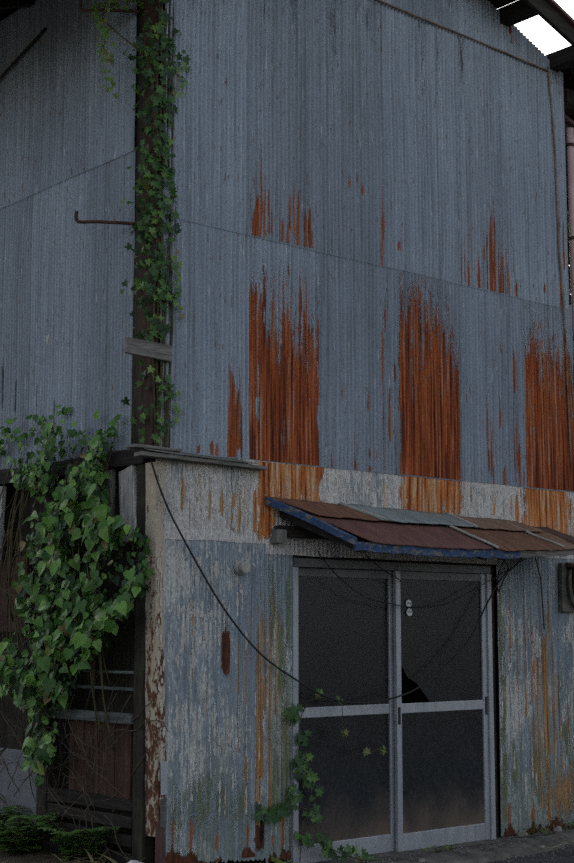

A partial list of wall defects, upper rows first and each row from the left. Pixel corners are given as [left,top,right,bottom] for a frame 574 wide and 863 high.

corrosion [252,160,313,248]
corrosion [461,202,518,297]
corrosion [197,265,332,541]
corrosion [369,282,472,516]
corrosion [486,305,574,536]
peeling [174,554,244,669]
peeling [157,654,187,781]
peeling [208,686,264,817]
corrosion [221,591,282,808]
corrosion [502,590,574,837]
corrosion [155,797,222,863]
corrosion [242,817,291,862]